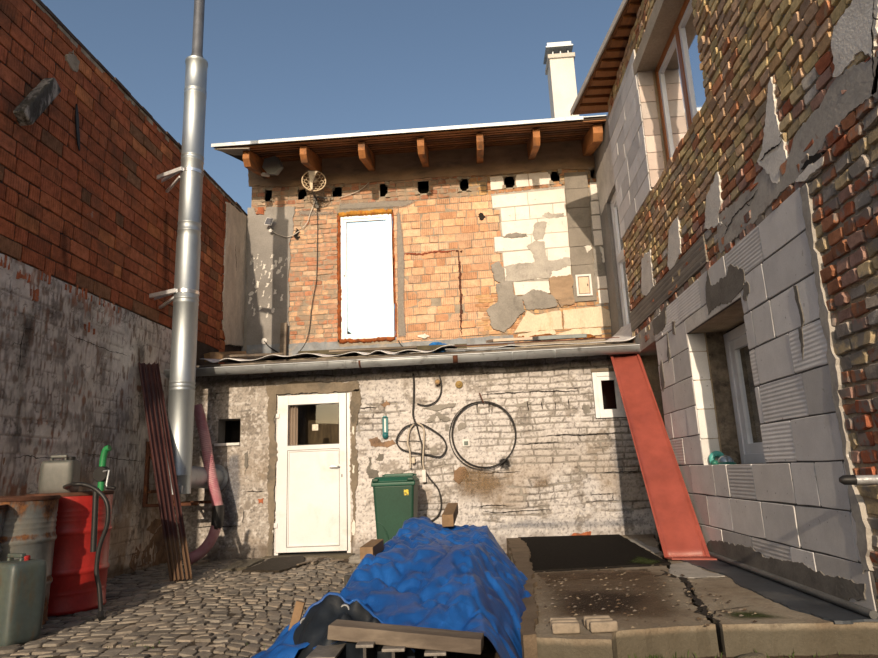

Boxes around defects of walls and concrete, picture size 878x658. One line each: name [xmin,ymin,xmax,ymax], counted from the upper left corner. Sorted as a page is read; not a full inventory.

crack [866,1,878,92]
spalling [801,152,825,170]
peeling [0,255,51,301]
crack [404,250,463,335]
crack [655,570,752,622]